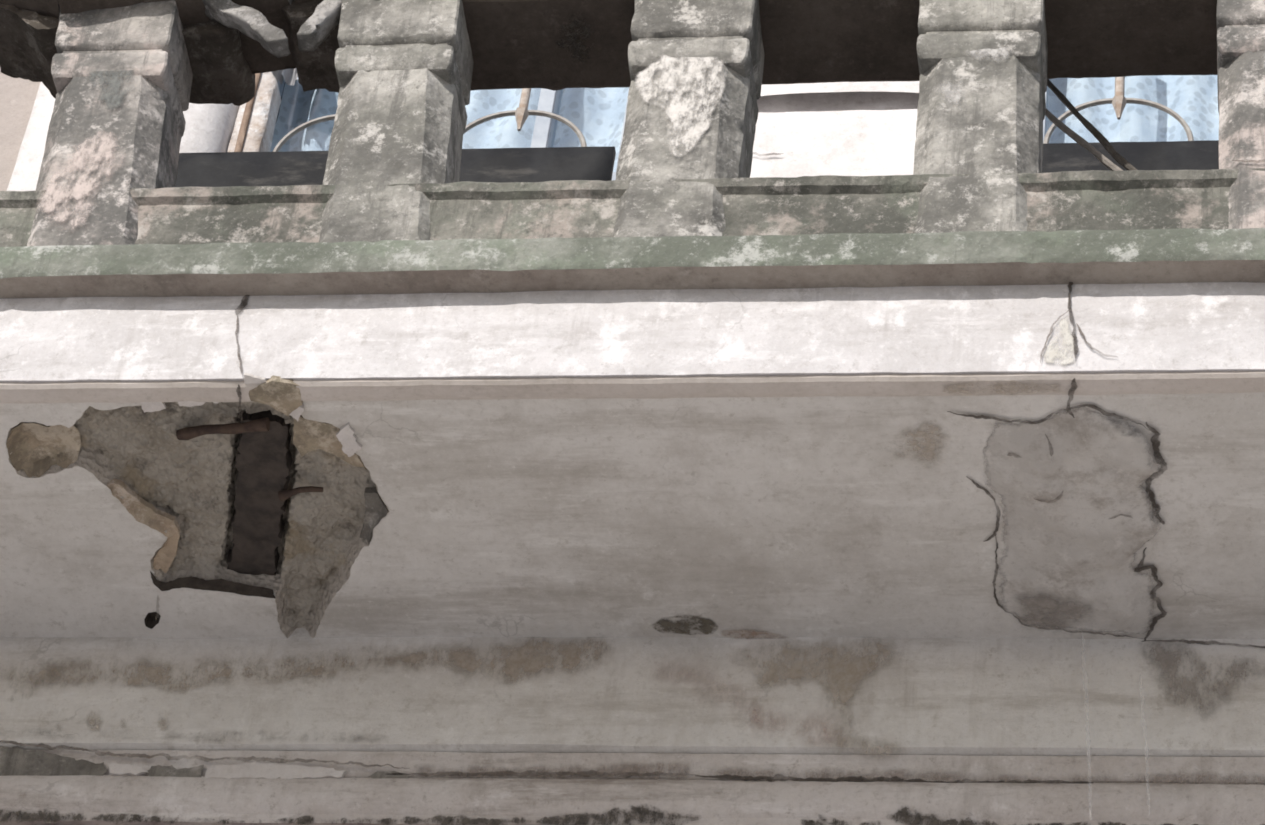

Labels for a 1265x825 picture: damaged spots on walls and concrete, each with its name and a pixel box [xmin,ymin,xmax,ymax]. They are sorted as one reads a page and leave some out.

crack [235,295,249,422]
crack [947,282,1265,648]
spalling [6,373,390,638]
leakage [388,639,603,680]
peeling [654,615,768,639]
leakage [1151,642,1251,709]
peeling [0,740,410,779]